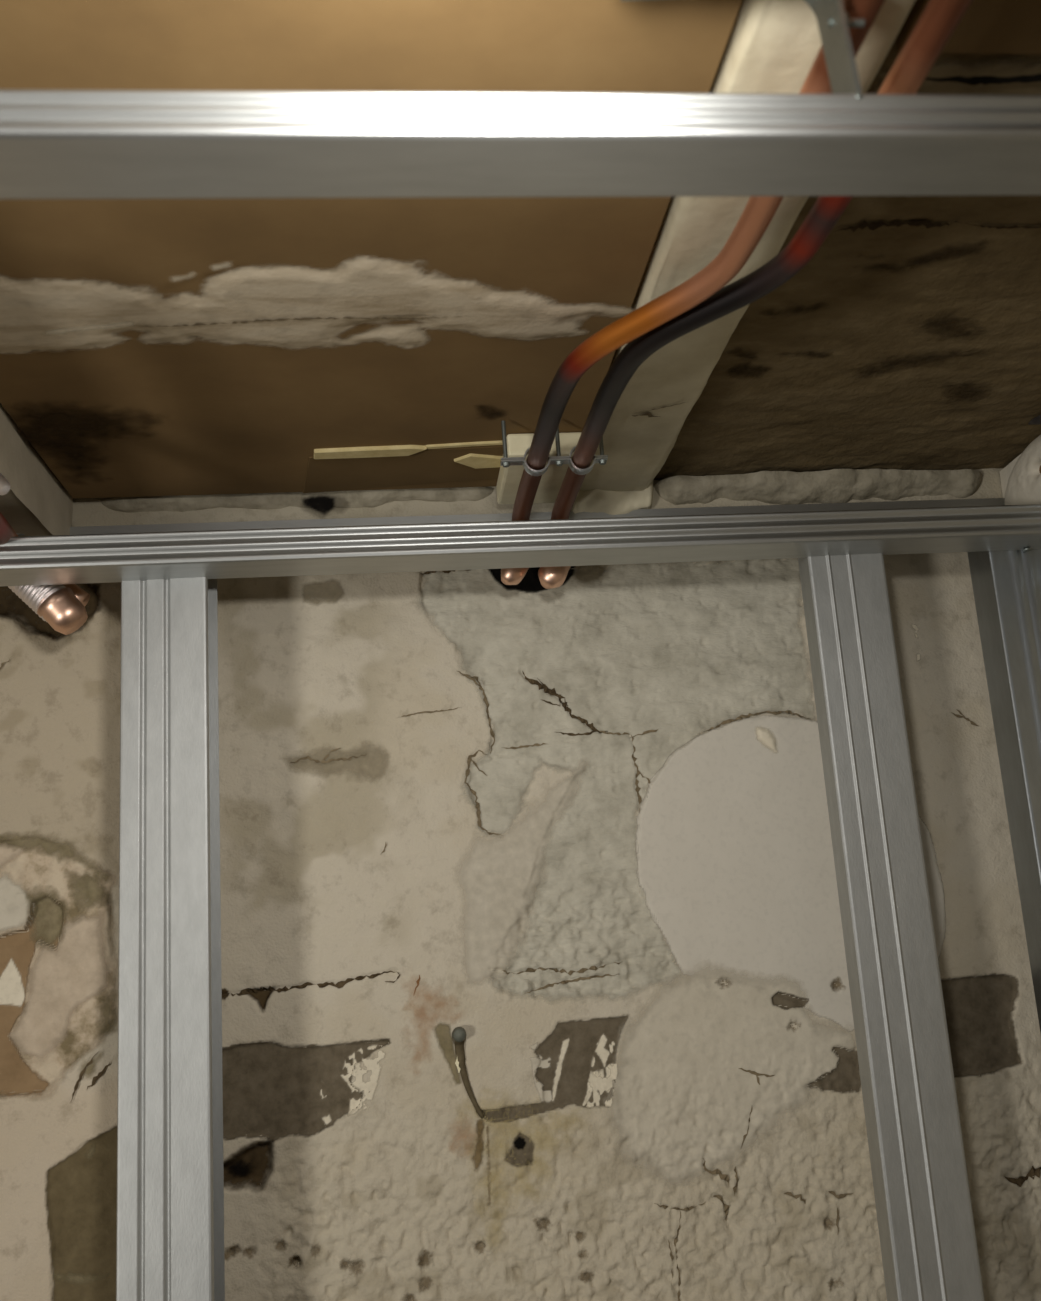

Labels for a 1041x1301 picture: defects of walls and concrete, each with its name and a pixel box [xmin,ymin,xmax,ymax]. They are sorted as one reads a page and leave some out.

crack [925,74,1041,85]
crack [397,671,660,836]
spalling [420,558,814,1001]
peeling [0,835,117,1098]
crack [222,971,400,996]
crack [502,961,623,993]
spalling [772,992,809,1029]
spalling [222,1039,390,1142]
spalling [481,1016,628,1122]
crack [654,1068,774,1301]
crack [784,1191,853,1232]